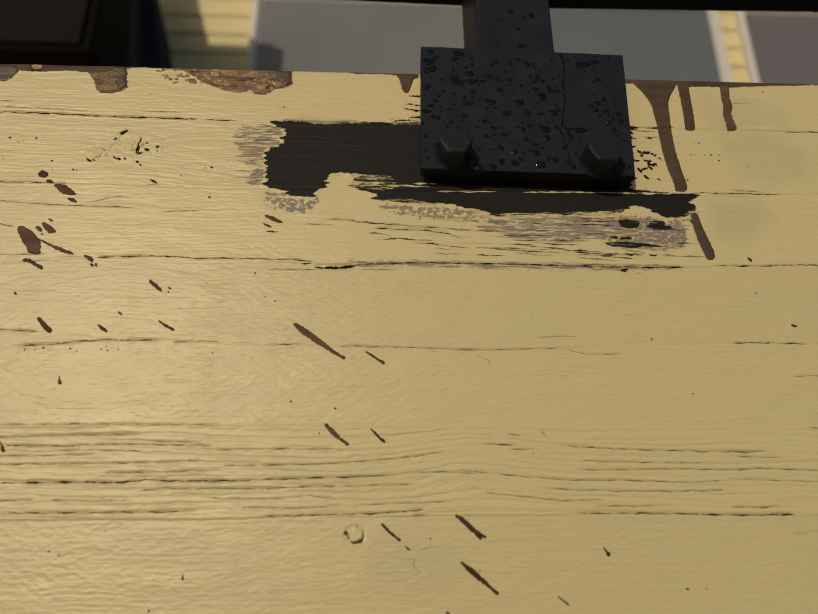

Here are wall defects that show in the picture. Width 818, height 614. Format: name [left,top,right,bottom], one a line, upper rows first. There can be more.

peeling [0,65,19,81]
peeling [90,67,128,93]
peeling [148,67,293,95]
peeling [233,95,704,274]